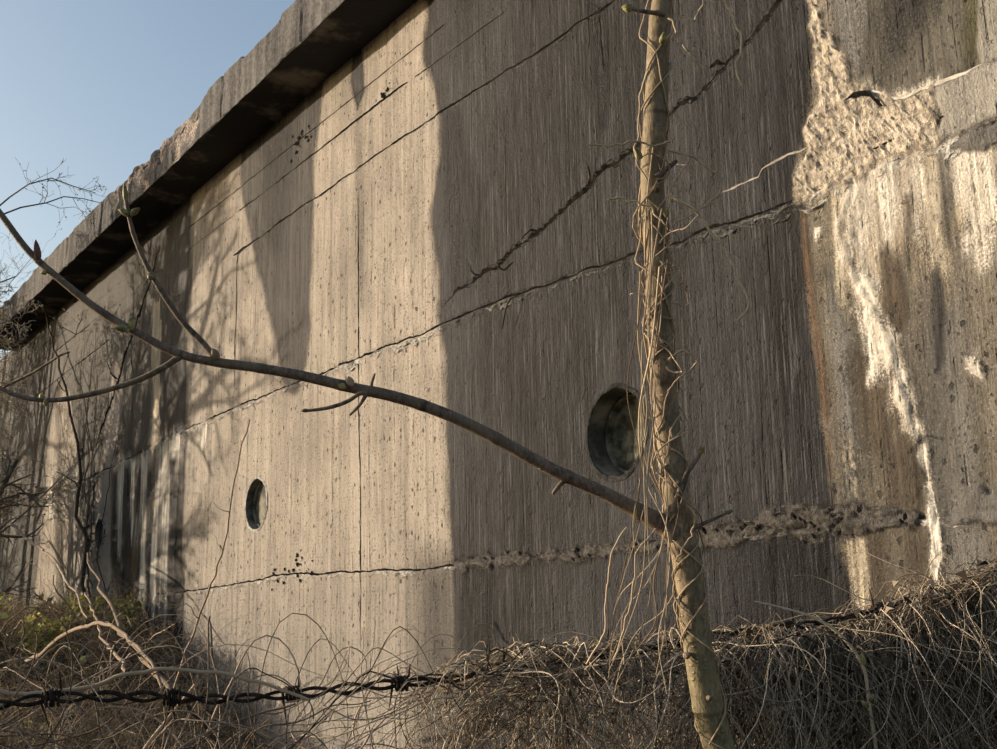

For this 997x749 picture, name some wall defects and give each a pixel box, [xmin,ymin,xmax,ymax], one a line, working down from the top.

water stain [0,196,207,659]
crack [442,143,642,310]
water stain [419,0,701,749]
crack [597,8,605,69]
crack [667,0,783,122]
crack [721,147,808,193]
water stain [665,0,997,638]
spalling [793,0,997,202]